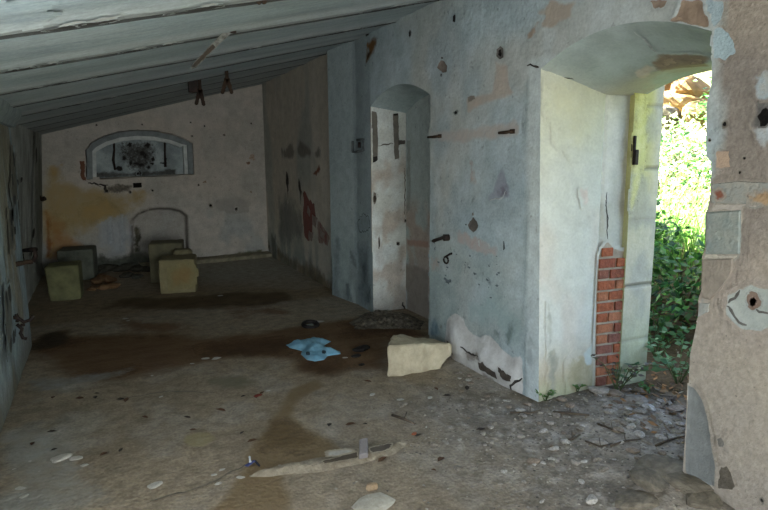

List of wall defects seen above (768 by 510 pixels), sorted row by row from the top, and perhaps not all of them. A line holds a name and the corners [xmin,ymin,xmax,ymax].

flaking render [643,0,738,72]
peeling [302,189,331,248]
crack [603,194,611,239]
leakage [0,132,443,510]
flaking render [582,239,625,387]